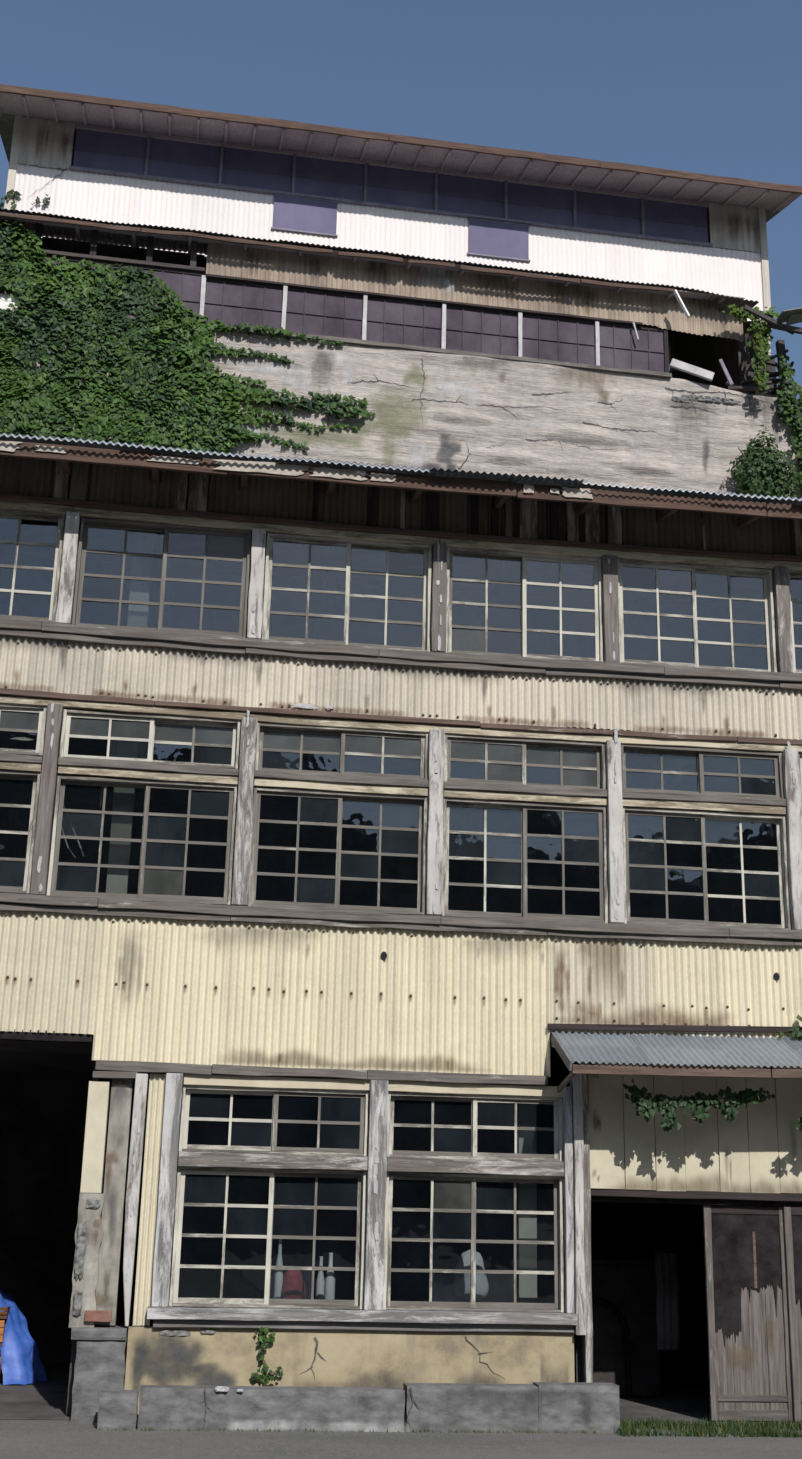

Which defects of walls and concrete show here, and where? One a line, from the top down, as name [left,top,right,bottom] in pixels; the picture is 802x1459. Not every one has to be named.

crack [348,358,768,469]
leakage [418,439,459,471]
peeling [711,1214,802,1346]
leakage [134,1337,234,1388]
crack [300,1337,326,1380]
crack [465,1336,505,1379]